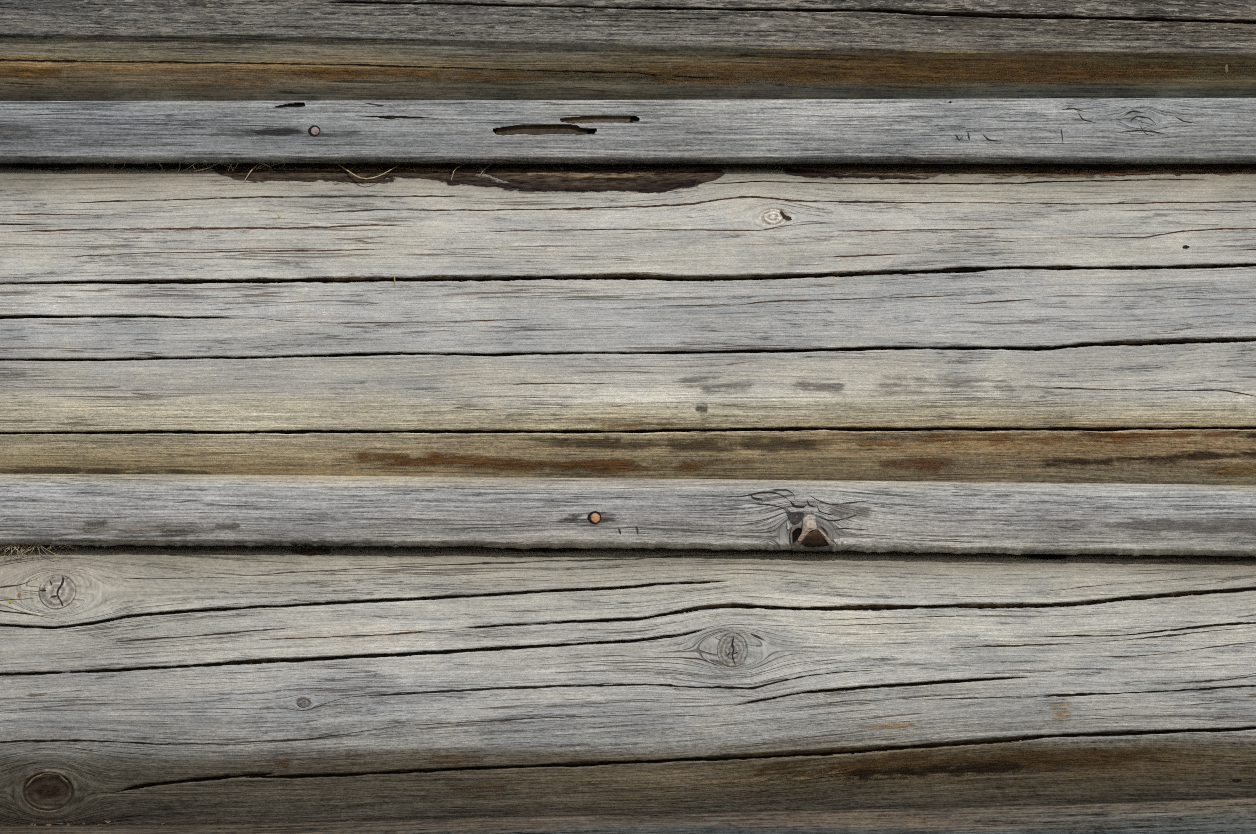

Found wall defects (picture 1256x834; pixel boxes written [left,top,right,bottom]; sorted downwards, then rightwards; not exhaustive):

crack [331,2,1256,24]
crack [0,179,1256,306]
crack [0,315,399,324]
crack [0,338,1256,384]
crack [1014,386,1254,396]
rust [562,513,615,522]
crack [0,526,1256,745]
crack [114,727,1256,793]